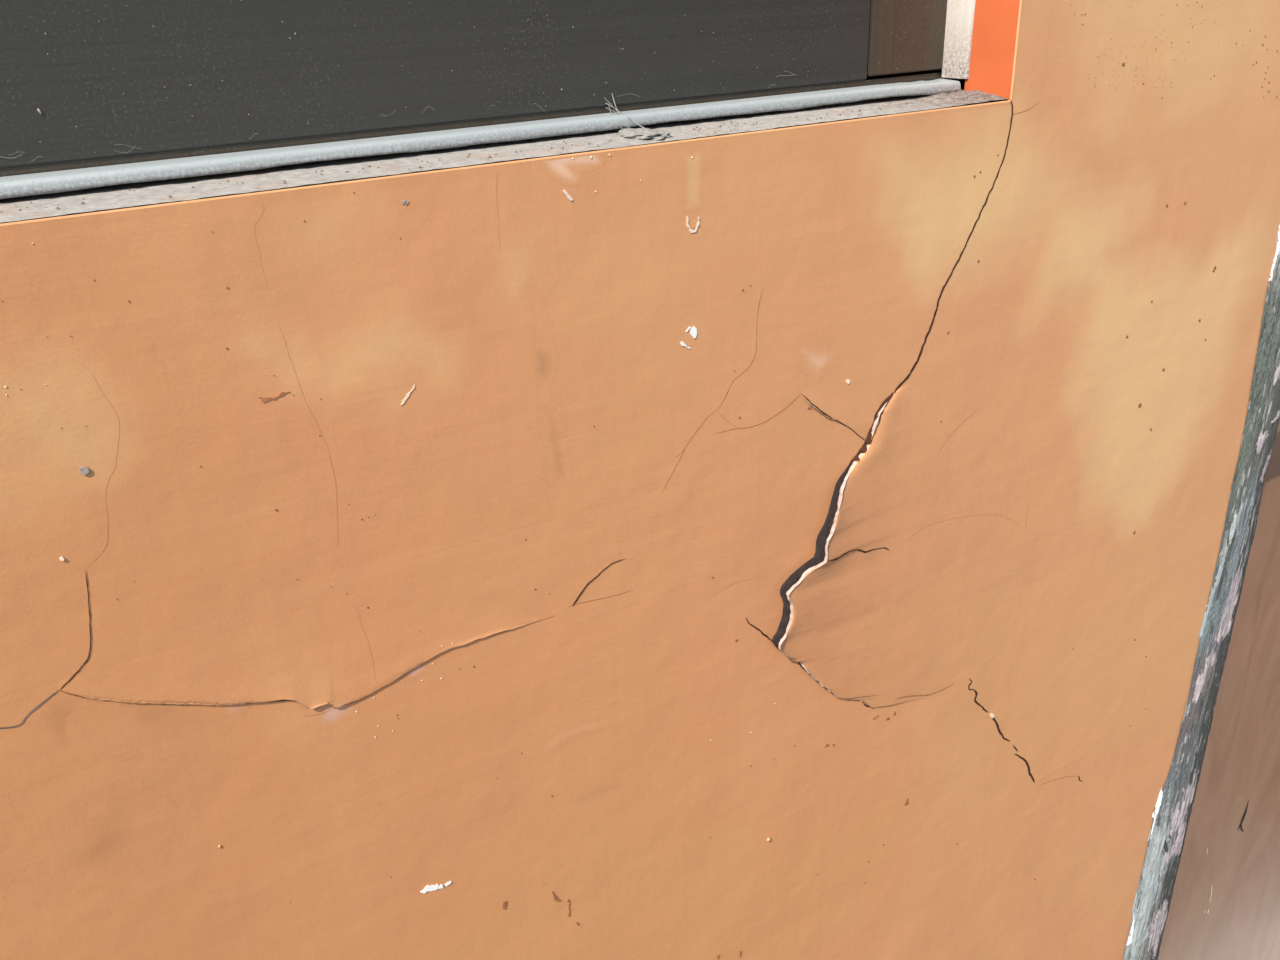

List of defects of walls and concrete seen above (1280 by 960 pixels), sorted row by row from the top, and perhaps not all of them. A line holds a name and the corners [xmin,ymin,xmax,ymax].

peeling [1269,224,1280,281]
crack [665,100,1083,785]
peeling [1256,411,1280,482]
crack [0,360,189,729]
crack [238,559,635,717]
peeling [1189,501,1246,704]
peeling [420,881,452,893]
peeling [1126,772,1198,960]